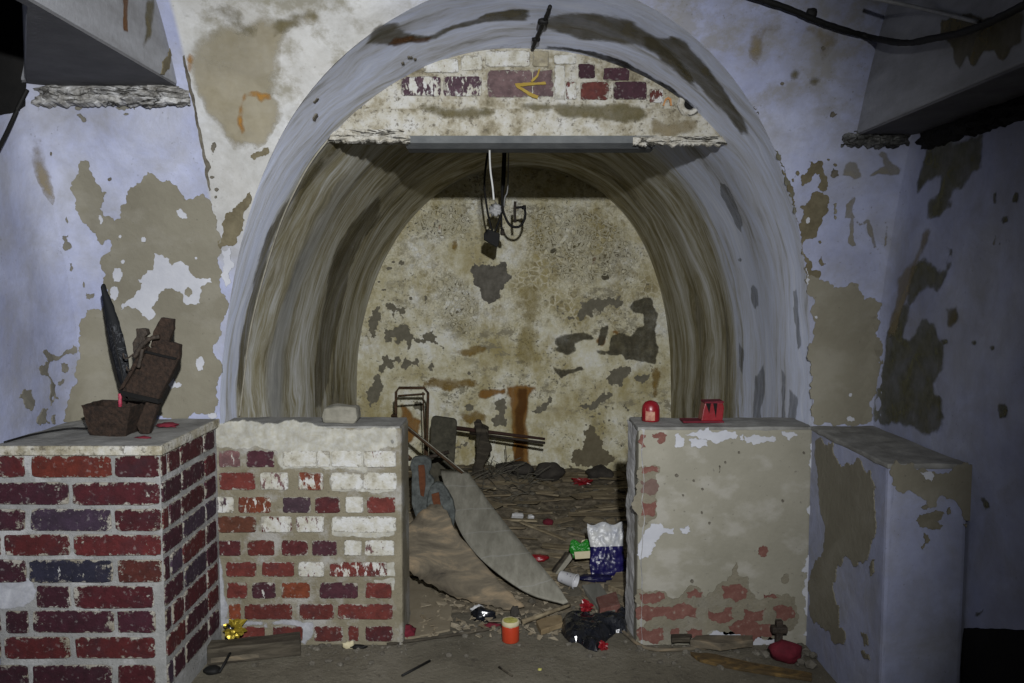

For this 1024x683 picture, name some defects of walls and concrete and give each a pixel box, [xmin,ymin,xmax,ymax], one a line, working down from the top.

damp [368,9,528,46]
spalling [31,48,191,122]
rust [238,92,269,130]
spalling [841,95,1024,150]
peeling [19,160,252,425]
spalling [470,262,512,304]
peeling [366,281,444,408]
rust [423,378,535,463]
peeling [491,398,507,427]
peeling [569,366,650,468]
peeling [631,150,883,645]
peeling [889,460,972,549]